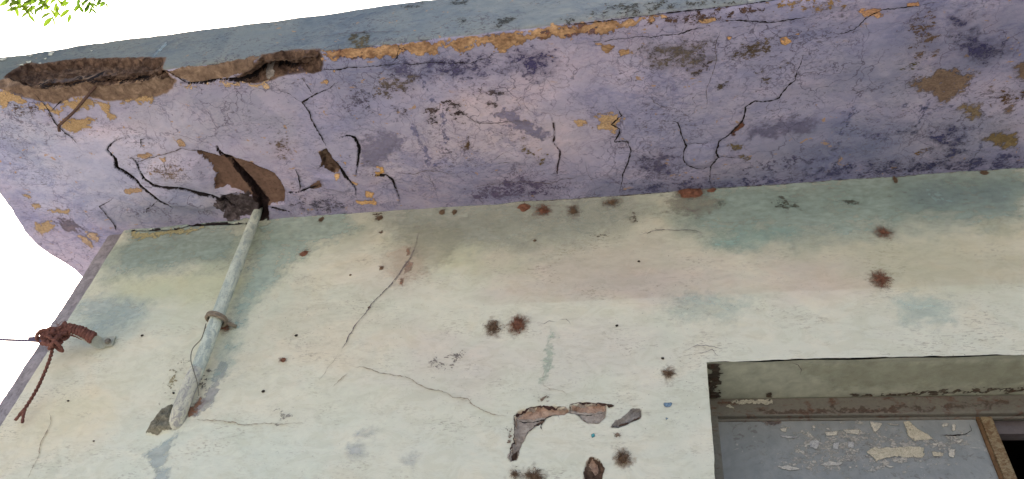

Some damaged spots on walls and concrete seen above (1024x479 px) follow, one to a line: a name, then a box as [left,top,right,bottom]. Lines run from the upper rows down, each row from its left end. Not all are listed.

spalling [0,0,884,134]
peeling [904,2,1024,120]
crack [282,0,916,235]
crack [99,138,318,231]
flaking render [197,150,285,222]
corrosion [676,187,717,199]
corrosion [868,269,894,289]
crack [319,232,615,458]
corrosion [485,313,529,336]
flaking render [505,395,641,461]
peeling [771,420,970,479]